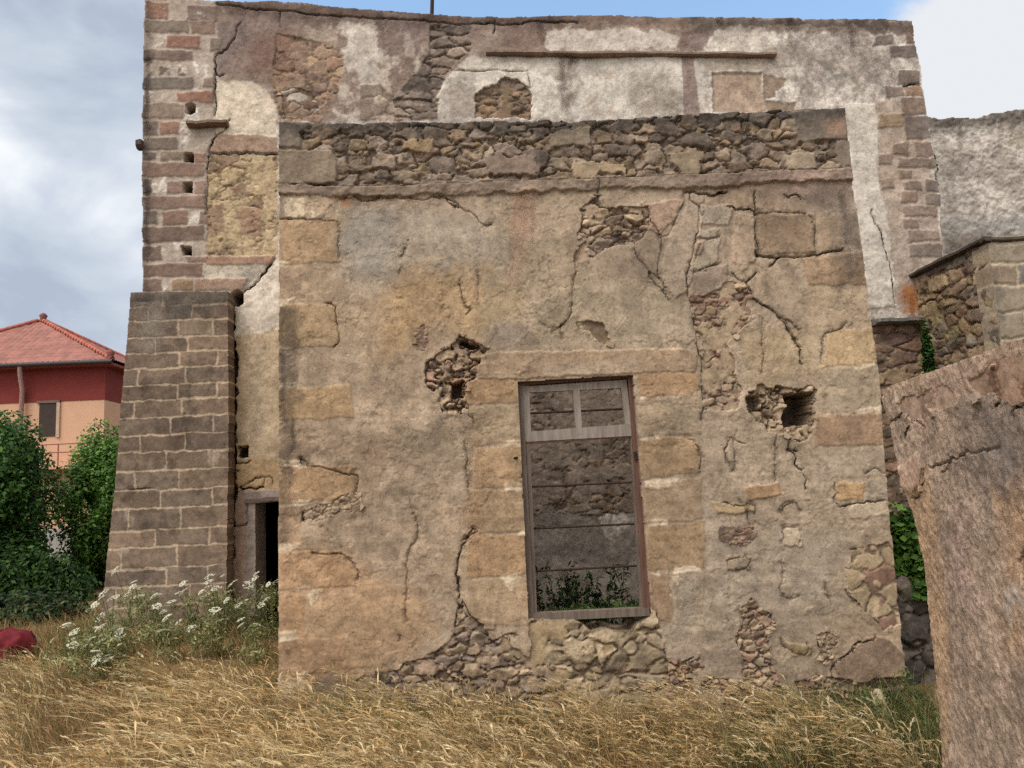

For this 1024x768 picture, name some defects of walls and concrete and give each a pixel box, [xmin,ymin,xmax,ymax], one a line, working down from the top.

crack [206,5,562,214]
spalling [474,75,532,120]
crack [349,195,481,223]
spalling [574,193,650,263]
crack [871,214,895,303]
crack [634,191,844,417]
spalling [412,326,489,414]
spalling [688,281,827,442]
crack [455,529,476,619]
spalling [345,597,904,728]
crack [825,588,880,673]
spalling [844,542,901,631]